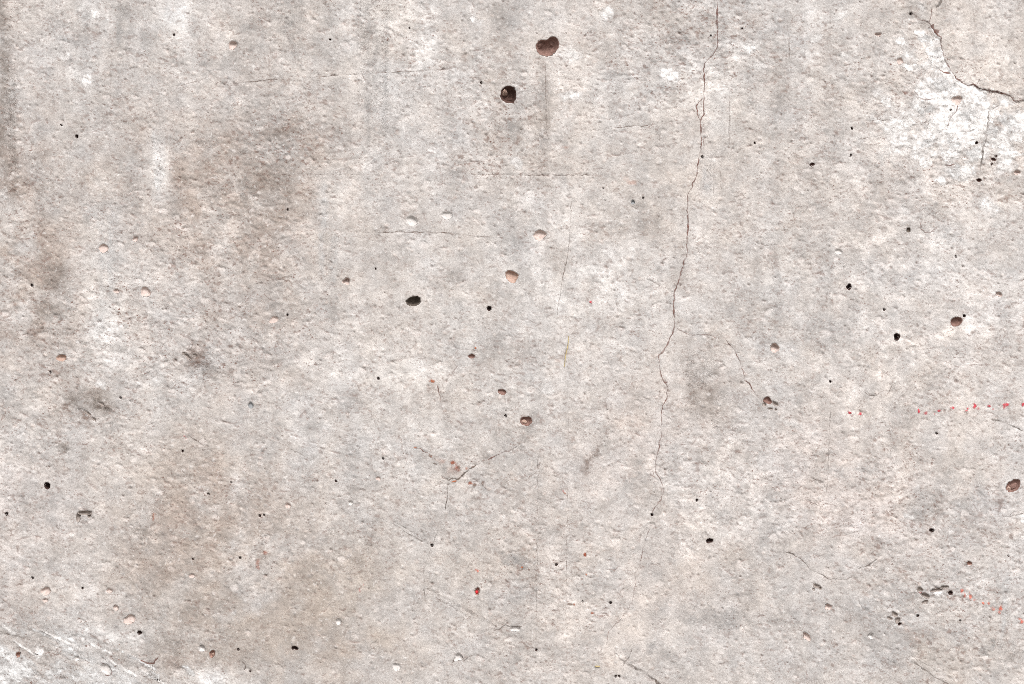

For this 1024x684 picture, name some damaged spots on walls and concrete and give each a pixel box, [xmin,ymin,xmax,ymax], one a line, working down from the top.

crack [658,6,718,448]
crack [918,0,1022,119]